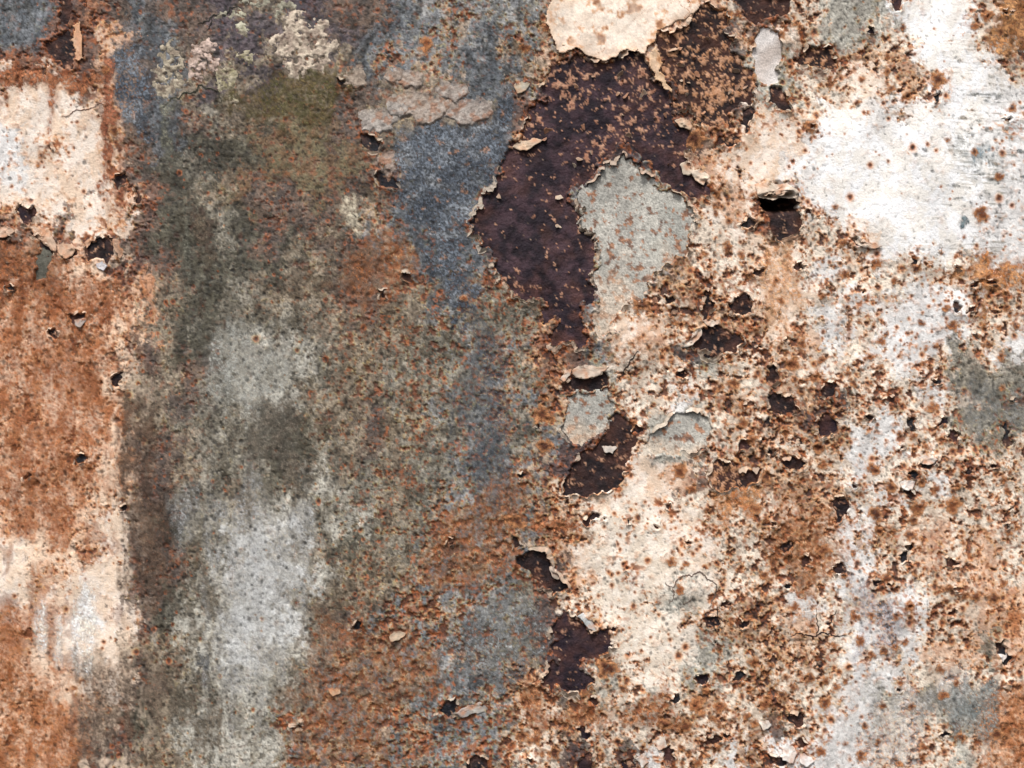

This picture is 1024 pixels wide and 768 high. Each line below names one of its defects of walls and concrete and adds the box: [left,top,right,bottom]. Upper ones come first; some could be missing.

peeling [46,0,83,69]
leakage [339,193,363,236]
peeling [466,0,841,364]
leakage [207,321,287,414]
peeling [561,407,703,501]
rust [705,471,875,620]
rust [867,463,896,492]
rust [867,476,963,541]
peeling [538,609,619,709]
rust [521,652,727,732]
rust [733,657,847,736]
rust [856,635,909,661]